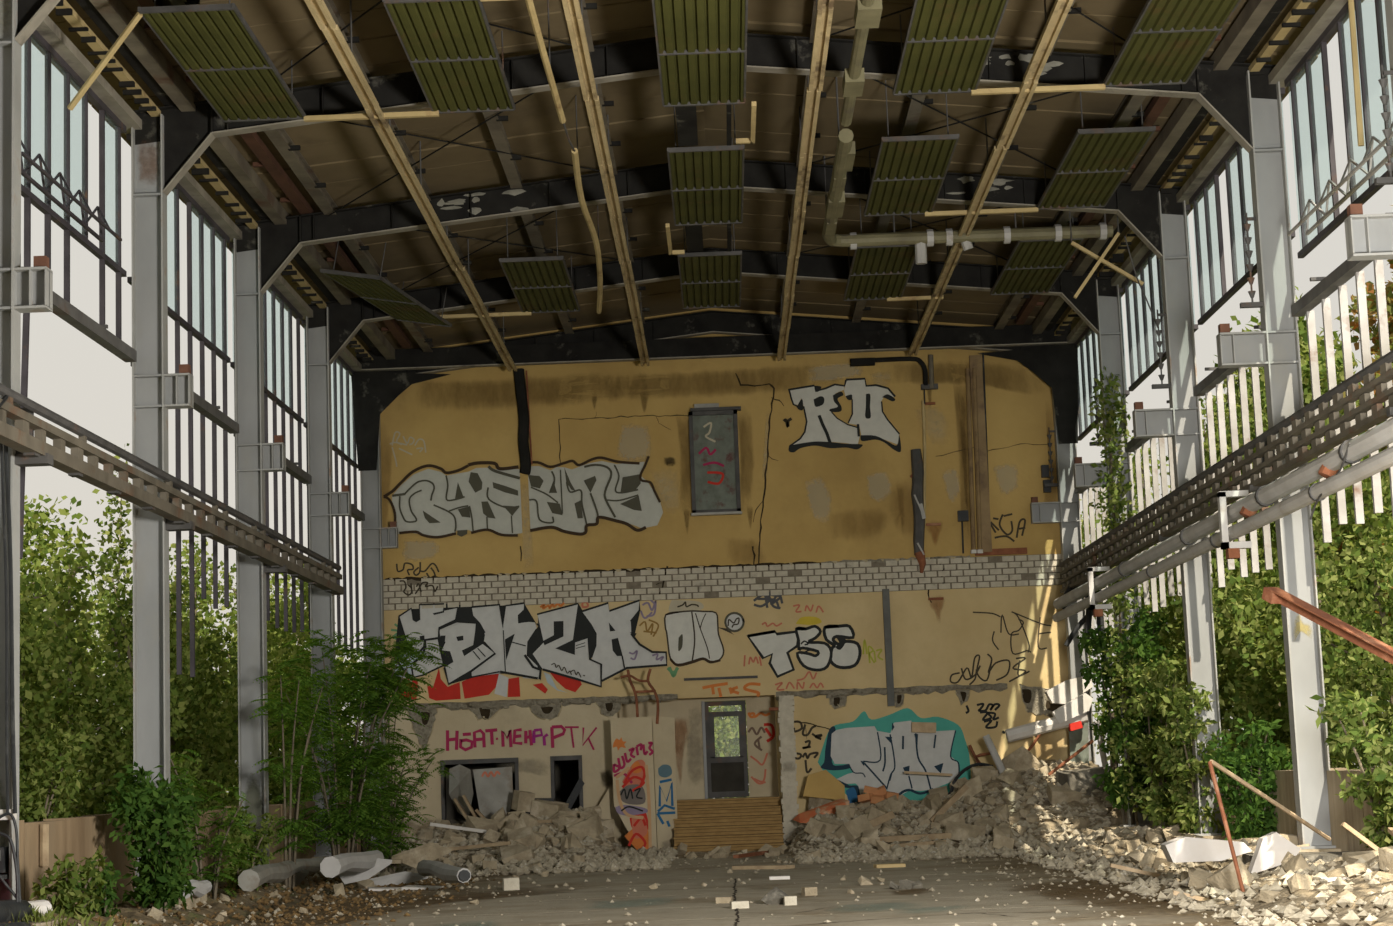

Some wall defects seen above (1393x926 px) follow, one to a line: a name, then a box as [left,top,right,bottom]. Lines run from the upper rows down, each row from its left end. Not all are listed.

crack [735,373,784,572]
crack [643,879,1017,926]